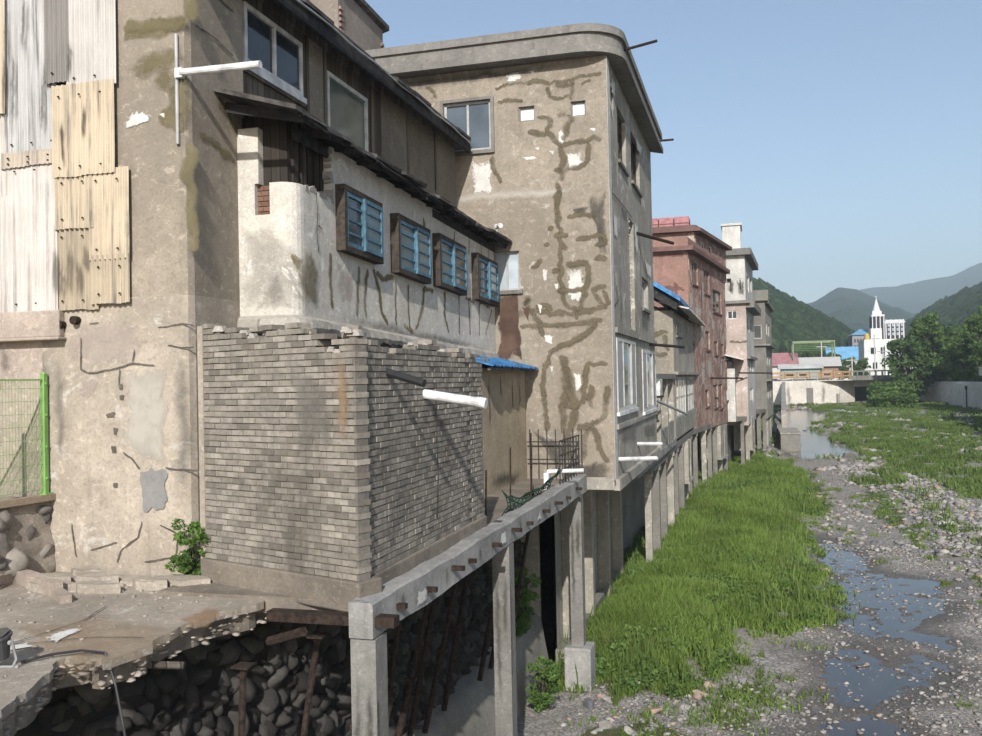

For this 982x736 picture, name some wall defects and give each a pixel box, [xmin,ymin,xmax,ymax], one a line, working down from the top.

damp [124,0,199,32]
crack [195,25,233,56]
damp [157,71,187,121]
flaking render [124,111,164,128]
crack [490,156,502,183]
peeling [456,161,564,202]
crack [495,72,685,463]
crack [80,322,195,385]
flaking render [140,468,167,512]
crack [71,521,178,563]
crack [14,605,107,645]